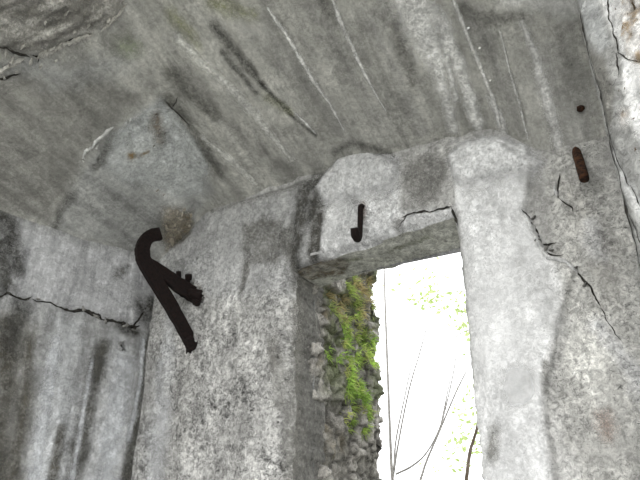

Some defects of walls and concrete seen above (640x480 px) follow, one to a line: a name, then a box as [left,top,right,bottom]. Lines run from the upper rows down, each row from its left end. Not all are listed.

crack [0,46,39,62]
crack [607,0,638,76]
crack [580,13,640,266]
crack [399,206,458,227]
crack [0,285,144,331]
crack [521,209,621,340]